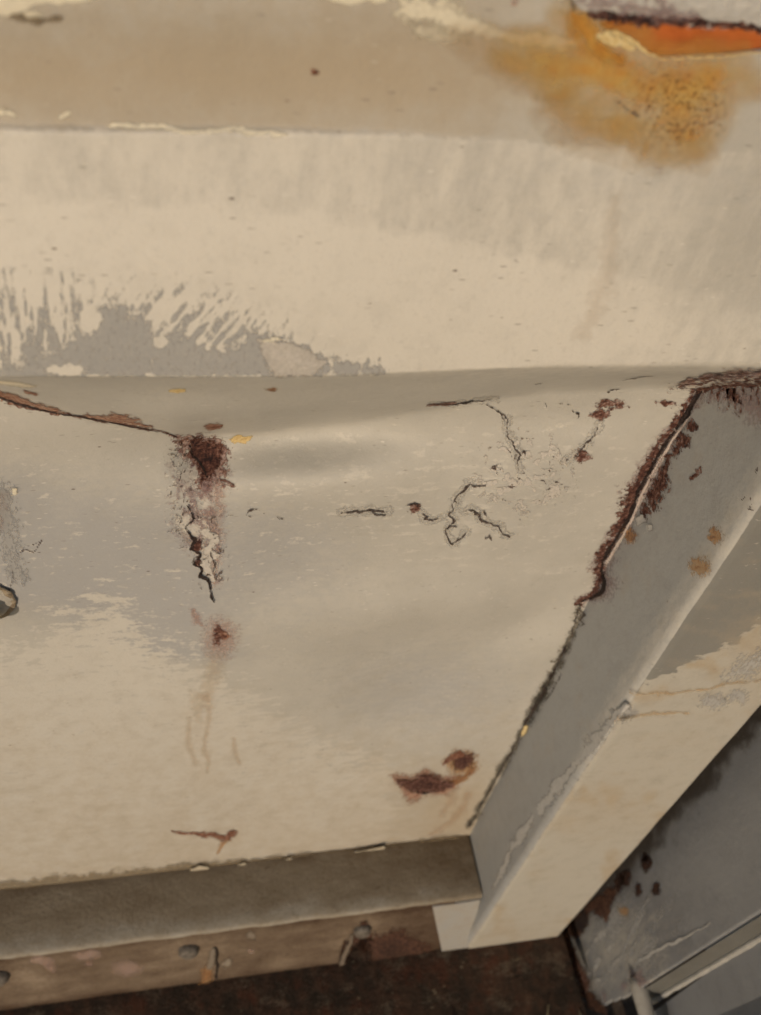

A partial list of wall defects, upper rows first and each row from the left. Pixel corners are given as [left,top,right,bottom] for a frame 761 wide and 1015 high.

peeling [0,0,92,25]
peeling [329,0,575,53]
rust [493,9,761,156]
peeling [596,30,761,60]
peeling [0,276,385,378]
crack [0,390,179,439]
crack [535,376,653,465]
crack [337,478,513,547]
rust [574,368,761,606]
crack [465,606,586,829]
rust [388,750,478,805]
rust [563,854,661,1015]